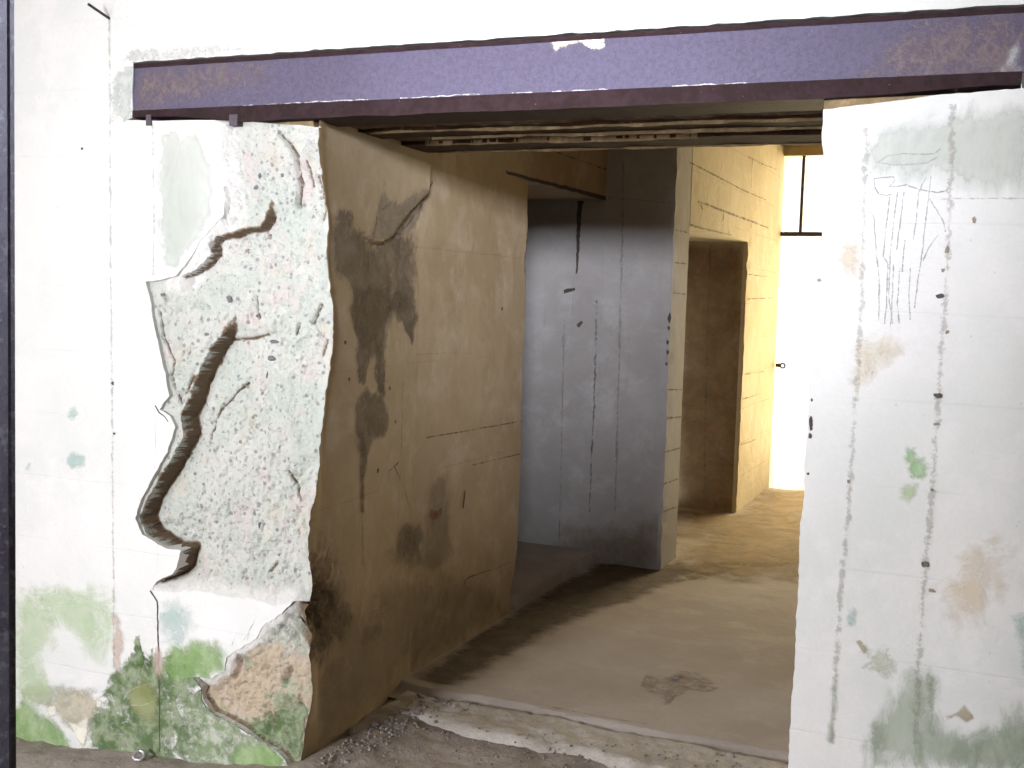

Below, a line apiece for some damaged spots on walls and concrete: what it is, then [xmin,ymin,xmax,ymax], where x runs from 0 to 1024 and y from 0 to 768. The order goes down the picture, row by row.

spalling [139,120,333,763]
damp [334,212,418,512]
damp [133,636,154,666]
damp [948,707,972,721]